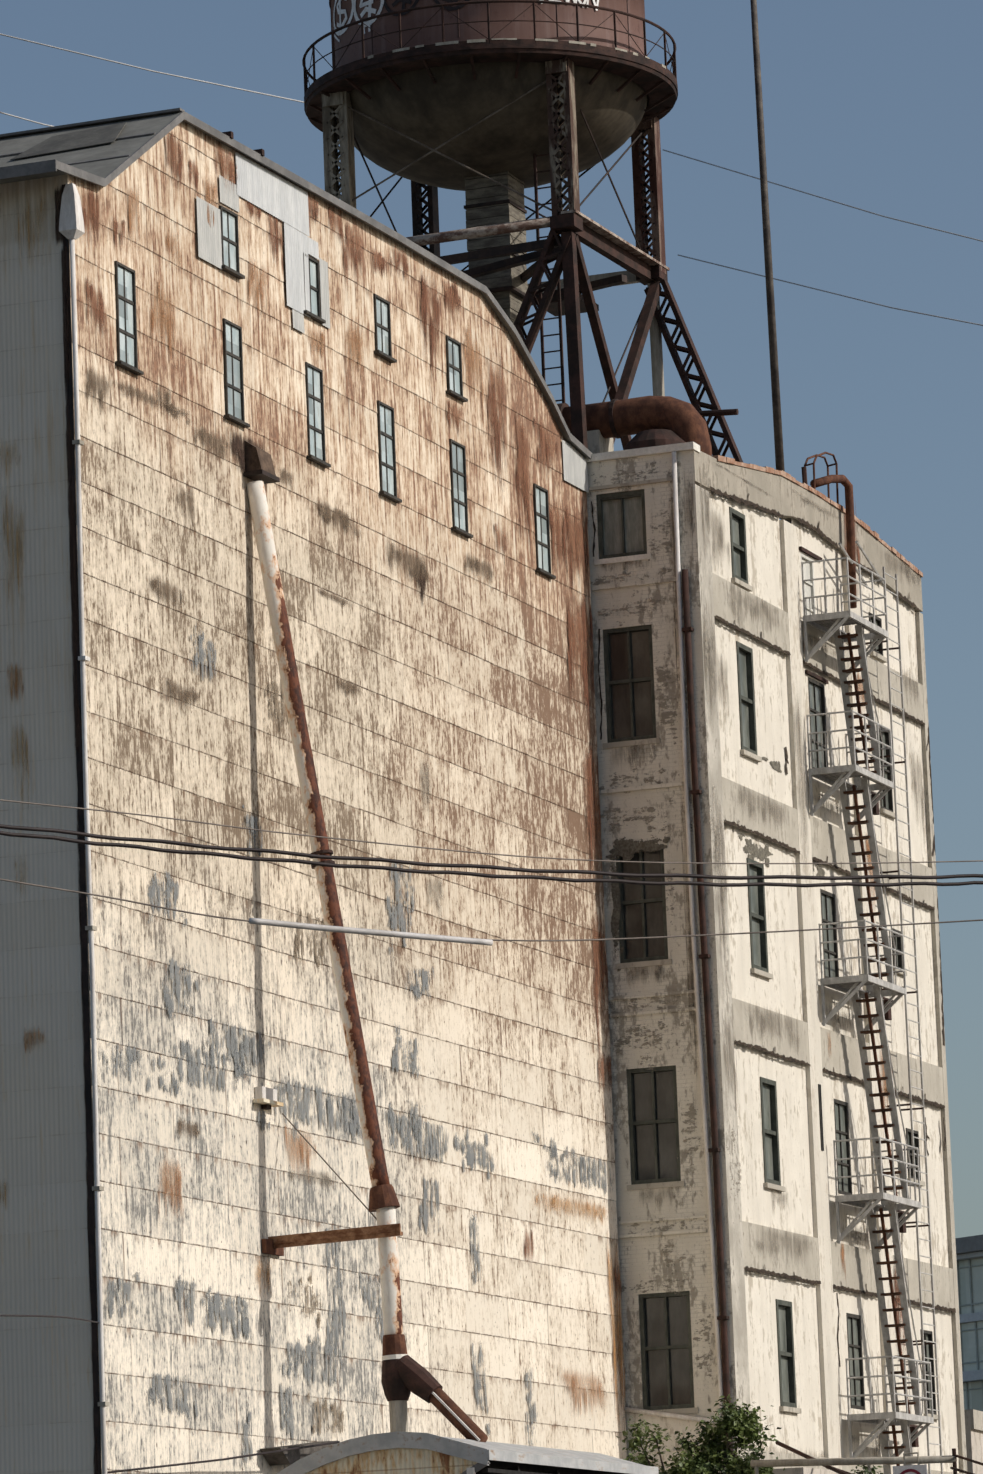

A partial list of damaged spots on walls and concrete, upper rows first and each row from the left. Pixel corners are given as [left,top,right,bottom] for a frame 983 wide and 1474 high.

corrosion [166,134,238,226]
corrosion [308,196,461,367]
water stain [87,367,264,471]
corrosion [464,333,557,560]
water stain [319,502,361,536]
water stain [387,541,429,602]
water stain [465,554,492,585]
corrosion [549,505,594,720]
peeling [590,498,673,626]
spalling [599,768,675,972]
peeling [609,996,683,1070]
peeling [677,1100,700,1166]